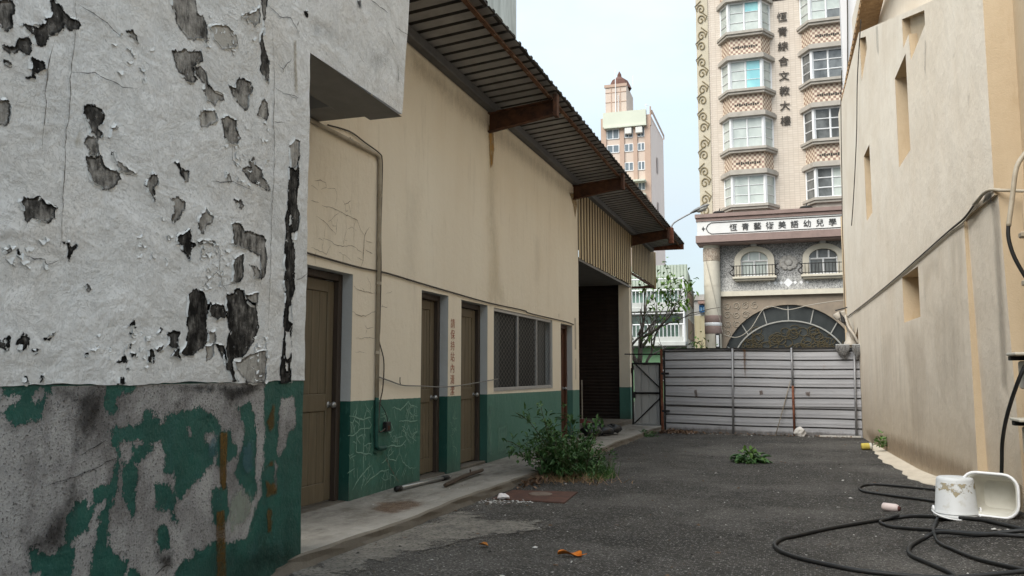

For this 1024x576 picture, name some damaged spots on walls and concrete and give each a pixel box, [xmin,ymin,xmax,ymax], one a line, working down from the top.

peeling [0,0,81,83]
peeling [0,97,13,127]
peeling [82,104,159,203]
peeling [170,0,271,191]
crack [297,180,392,353]
peeling [0,137,301,576]
crack [347,401,418,490]